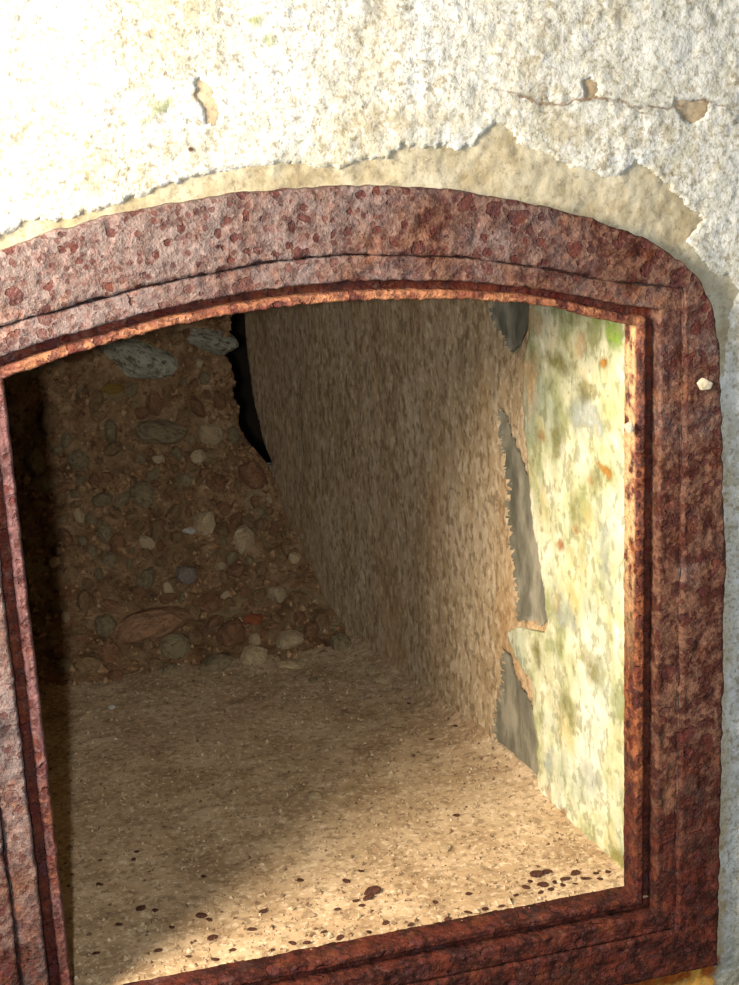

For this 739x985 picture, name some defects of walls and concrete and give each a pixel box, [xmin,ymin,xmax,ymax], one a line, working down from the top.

crack [512,92,707,113]
rust [625,957,720,985]